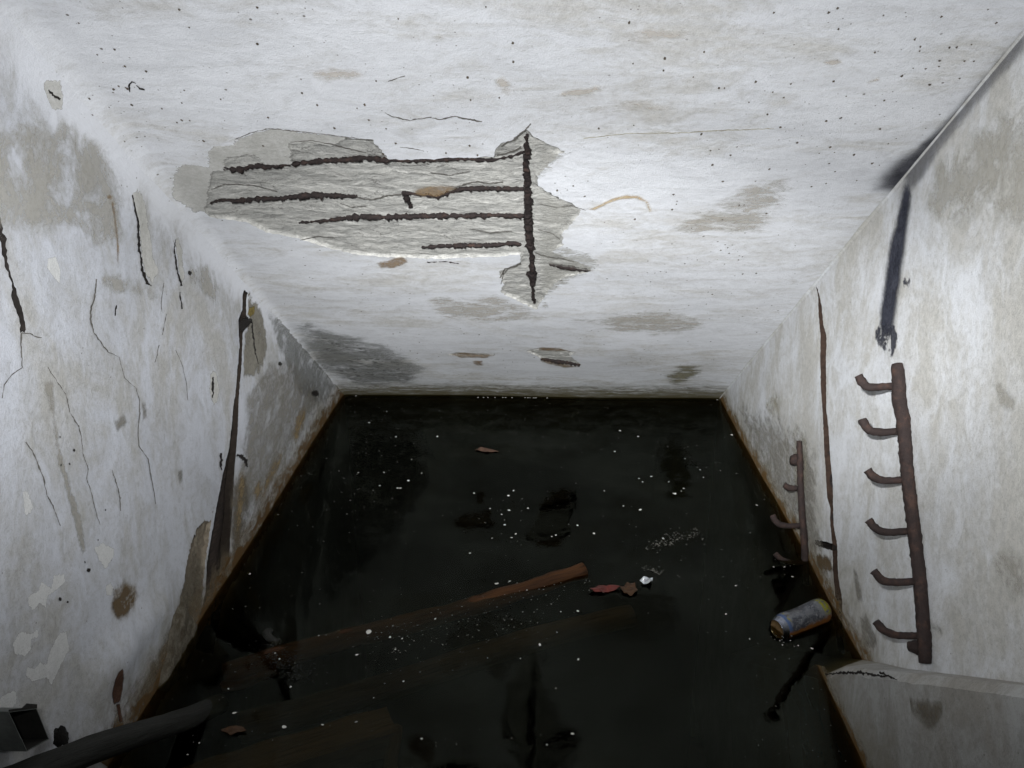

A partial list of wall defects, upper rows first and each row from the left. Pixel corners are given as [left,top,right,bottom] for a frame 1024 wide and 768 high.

crack [0,218,42,398]
crack [26,442,61,526]
crack [48,367,121,523]
crack [90,279,156,504]
rust [210,133,537,304]
spalling [172,117,595,309]
water stain [181,318,876,661]
spalling [527,347,580,365]
rust [549,262,589,272]
water stain [875,186,911,356]
rust [112,583,136,618]
water stain [112,635,169,728]